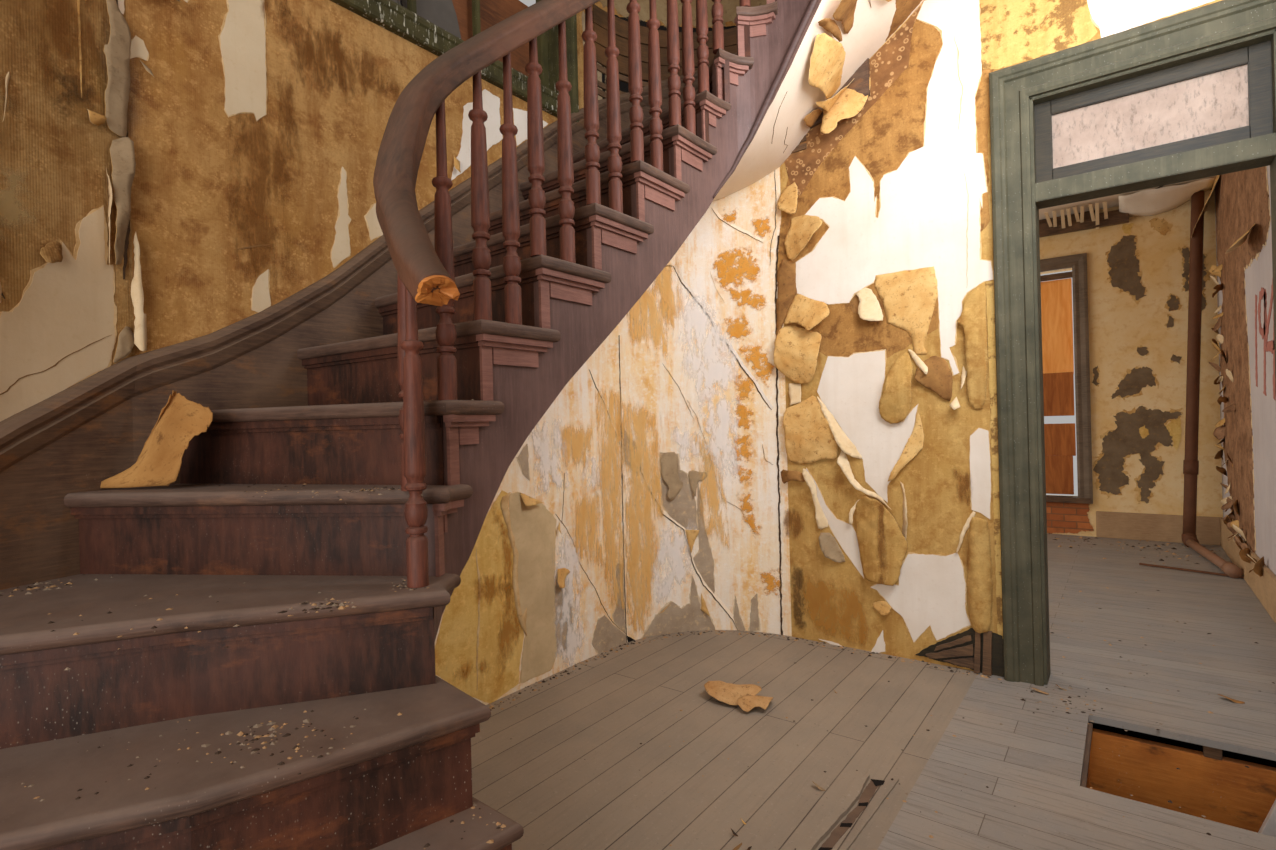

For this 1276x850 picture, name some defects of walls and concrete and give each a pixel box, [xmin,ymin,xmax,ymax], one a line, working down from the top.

flaking render [218,0,268,122]
spalling [581,0,767,100]
flaking render [1087,0,1215,38]
crack [0,335,110,395]
flaking render [0,0,155,422]
flaking render [250,270,271,313]
flaking render [330,167,383,268]
spalling [508,444,573,684]
crack [556,335,738,643]
crack [664,265,783,635]
crack [712,92,788,334]
flaking render [774,0,994,653]